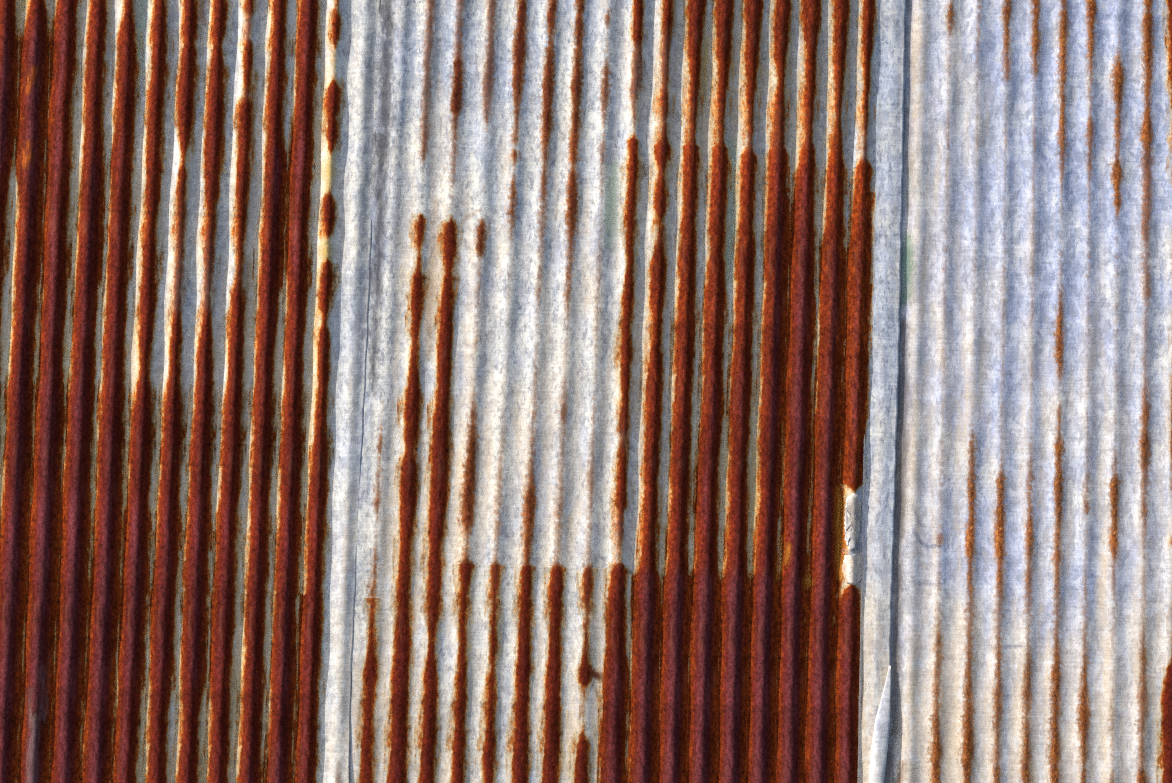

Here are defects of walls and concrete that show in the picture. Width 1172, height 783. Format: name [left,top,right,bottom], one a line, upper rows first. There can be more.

corrosion [1057,0,1069,181]
corrosion [1109,53,1125,216]
corrosion [1139,0,1172,298]
corrosion [0,0,345,783]
corrosion [354,0,878,783]
corrosion [928,624,943,783]
corrosion [961,434,977,783]
corrosion [992,469,1008,783]
corrosion [1048,404,1065,783]
corrosion [1076,633,1091,783]
corrosion [1139,385,1152,534]
corrosion [1137,629,1172,783]